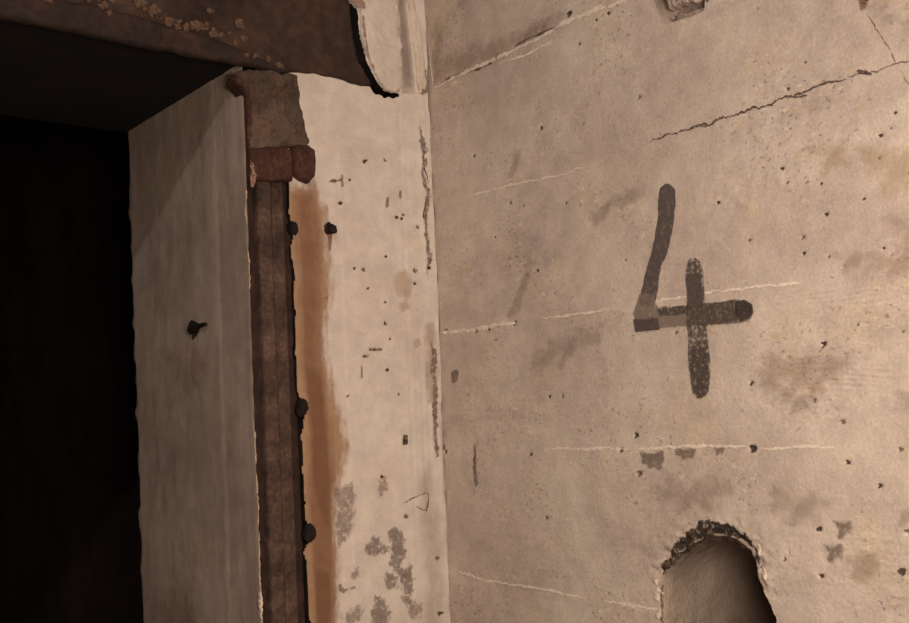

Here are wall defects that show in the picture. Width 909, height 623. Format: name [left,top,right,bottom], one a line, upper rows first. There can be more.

spalling [348,0,403,93]
crack [653,16,909,140]
rust [288,183,349,623]
hole [653,519,777,623]